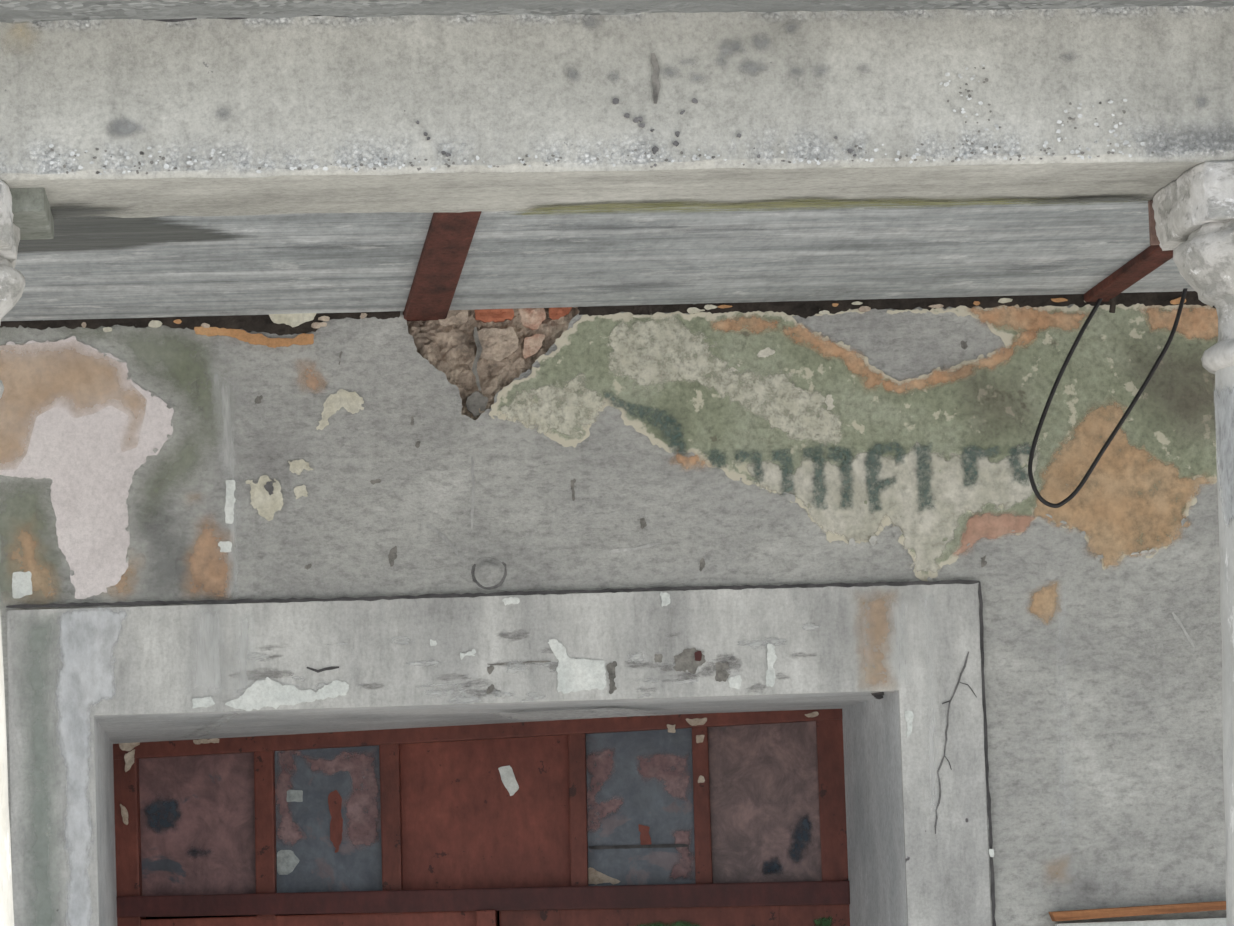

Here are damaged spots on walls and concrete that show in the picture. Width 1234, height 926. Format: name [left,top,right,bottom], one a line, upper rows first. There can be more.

damp [18,208,242,253]
peeling [0,291,1234,599]
spalling [502,597,520,606]
spalling [660,592,670,607]
spalling [192,652,349,711]
spalling [424,638,786,703]
crack [6,580,996,926]